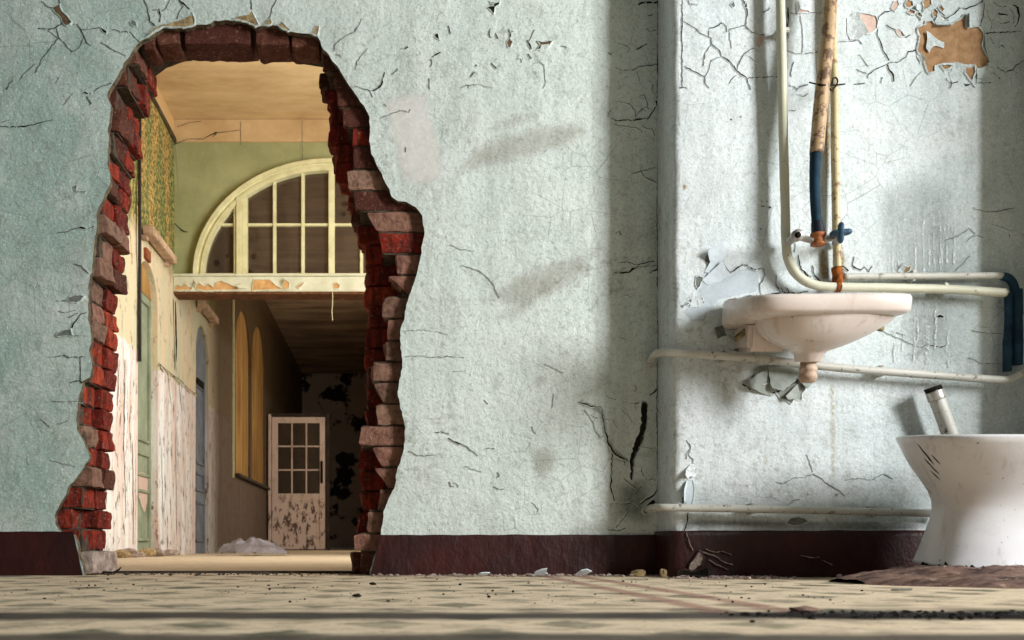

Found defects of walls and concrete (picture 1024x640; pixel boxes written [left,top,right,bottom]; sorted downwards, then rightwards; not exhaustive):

crack [0,0,189,129]
spalling [144,12,196,38]
spalling [232,11,291,33]
crack [462,28,567,89]
crack [607,0,921,136]
peeling [890,0,1005,83]
peeling [681,245,730,308]
crack [723,243,820,297]
spalling [55,328,74,338]
peeling [173,278,306,371]
crack [544,315,688,532]
crack [408,430,504,490]